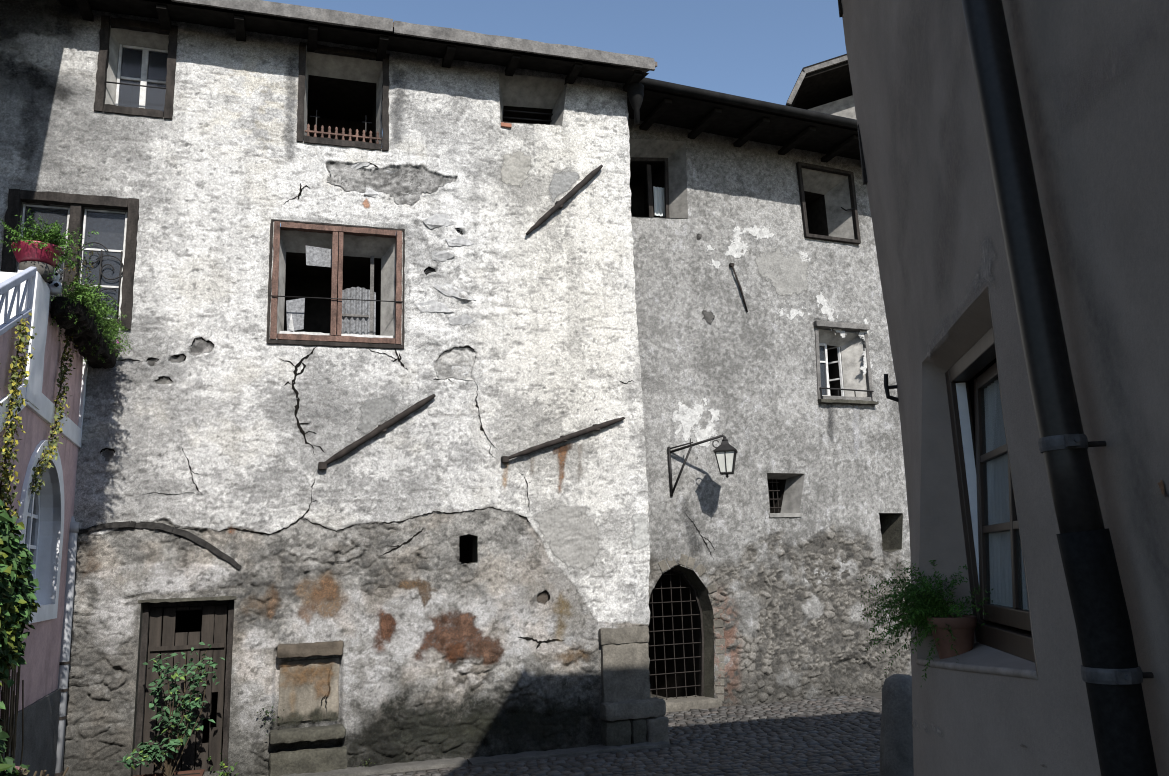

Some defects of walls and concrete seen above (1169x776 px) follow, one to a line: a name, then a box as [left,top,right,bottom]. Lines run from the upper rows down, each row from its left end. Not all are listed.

water stain [0,54,68,160]
spalling [326,161,457,206]
peeling [697,224,774,269]
spalling [147,337,214,384]
crack [212,346,532,555]
corrosion [554,444,572,491]
corrosion [296,573,346,623]
corrosion [399,579,431,606]
spalling [537,590,550,605]
corrosion [375,611,397,651]
corrosion [415,611,504,664]